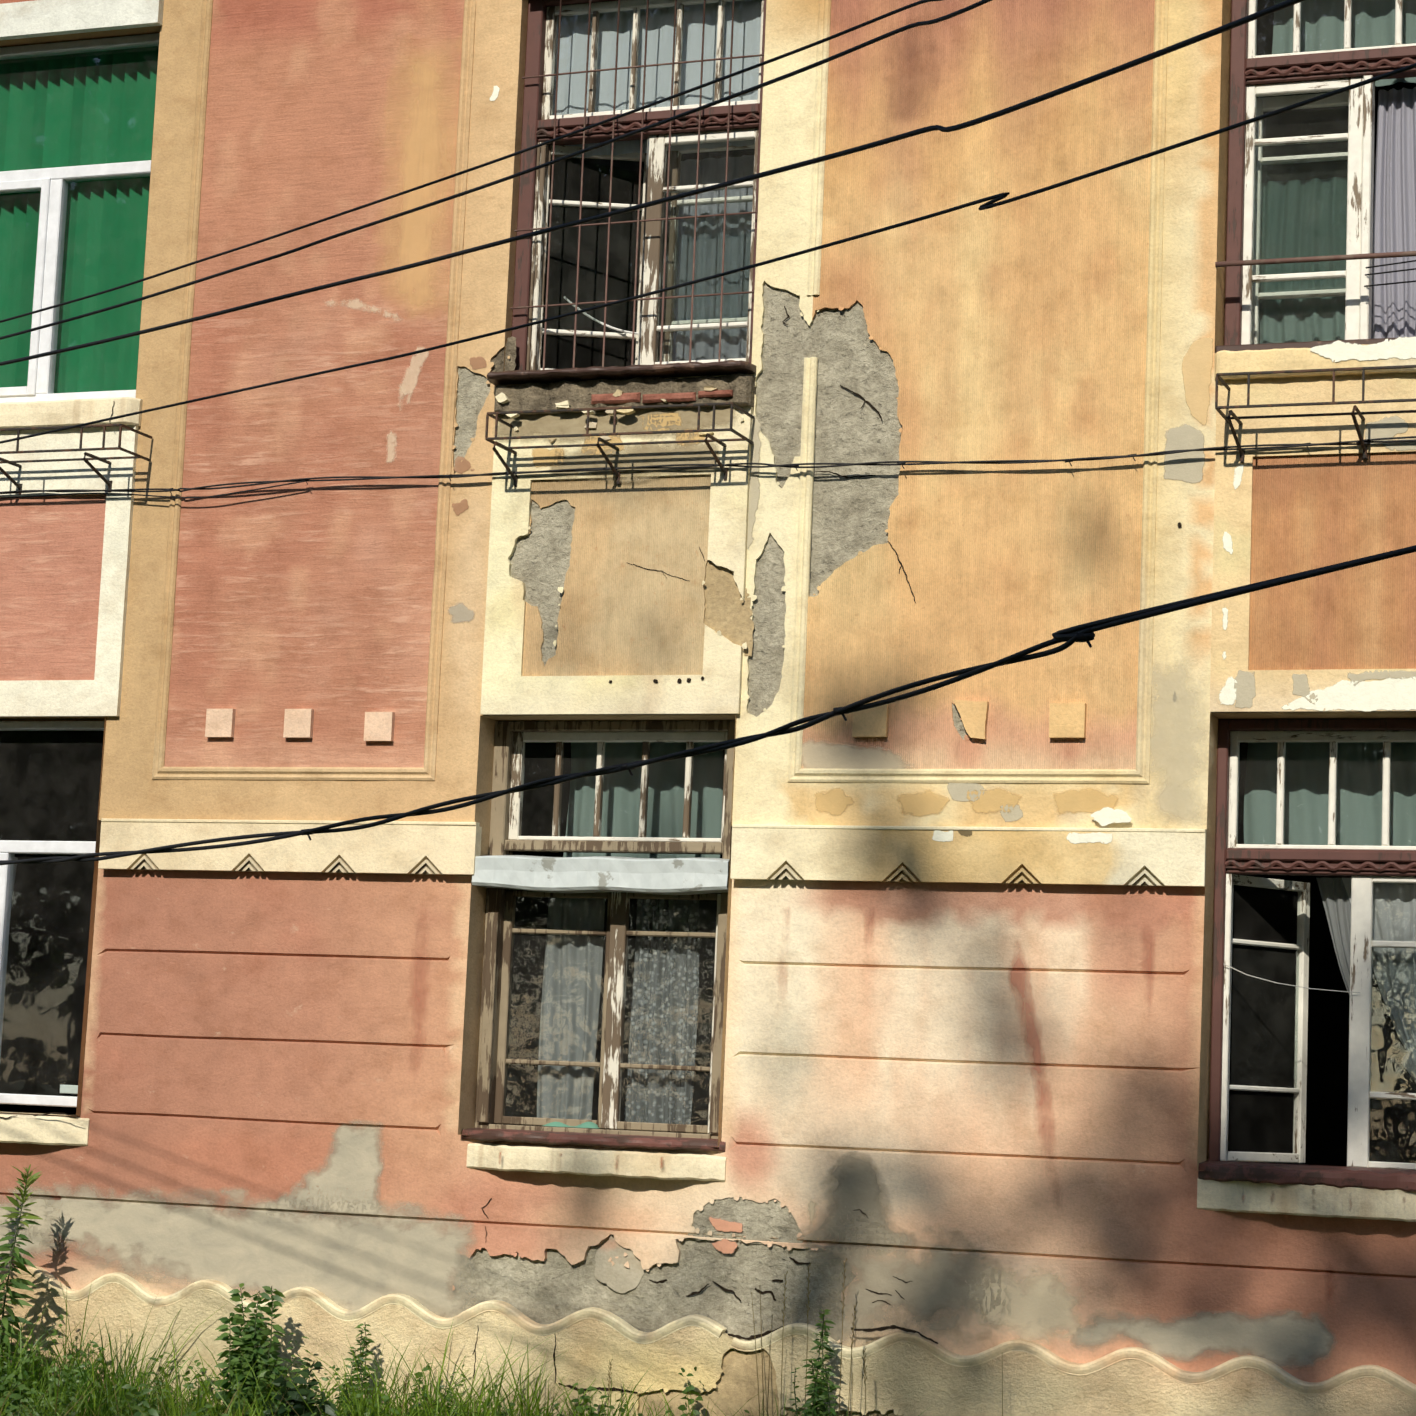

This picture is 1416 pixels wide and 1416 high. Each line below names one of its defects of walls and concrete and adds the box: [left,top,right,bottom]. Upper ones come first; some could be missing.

spalling [452,336,516,474]
spalling [756,282,903,597]
peeling [1310,337,1416,362]
spalling [510,500,575,666]
crack [626,547,705,581]
spalling [702,534,786,717]
crack [887,541,916,603]
peeling [1282,670,1416,712]
peeling [1054,788,1131,844]
damp [1010,958,1045,1106]
spalling [452,1196,855,1416]
damp [802,1155,1333,1366]